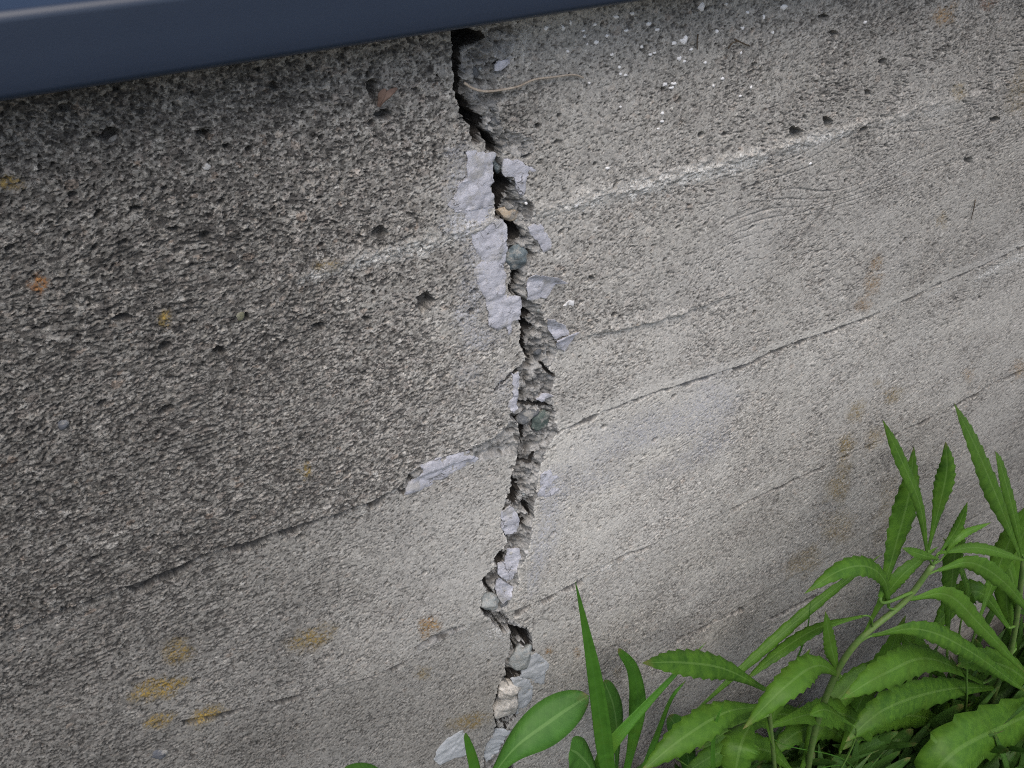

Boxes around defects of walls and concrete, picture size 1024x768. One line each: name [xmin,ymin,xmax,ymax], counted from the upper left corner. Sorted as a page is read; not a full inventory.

flaking render [448,149,568,334]
flaking render [402,372,520,495]
flaking render [547,319,579,351]
crack [182,24,1024,768]